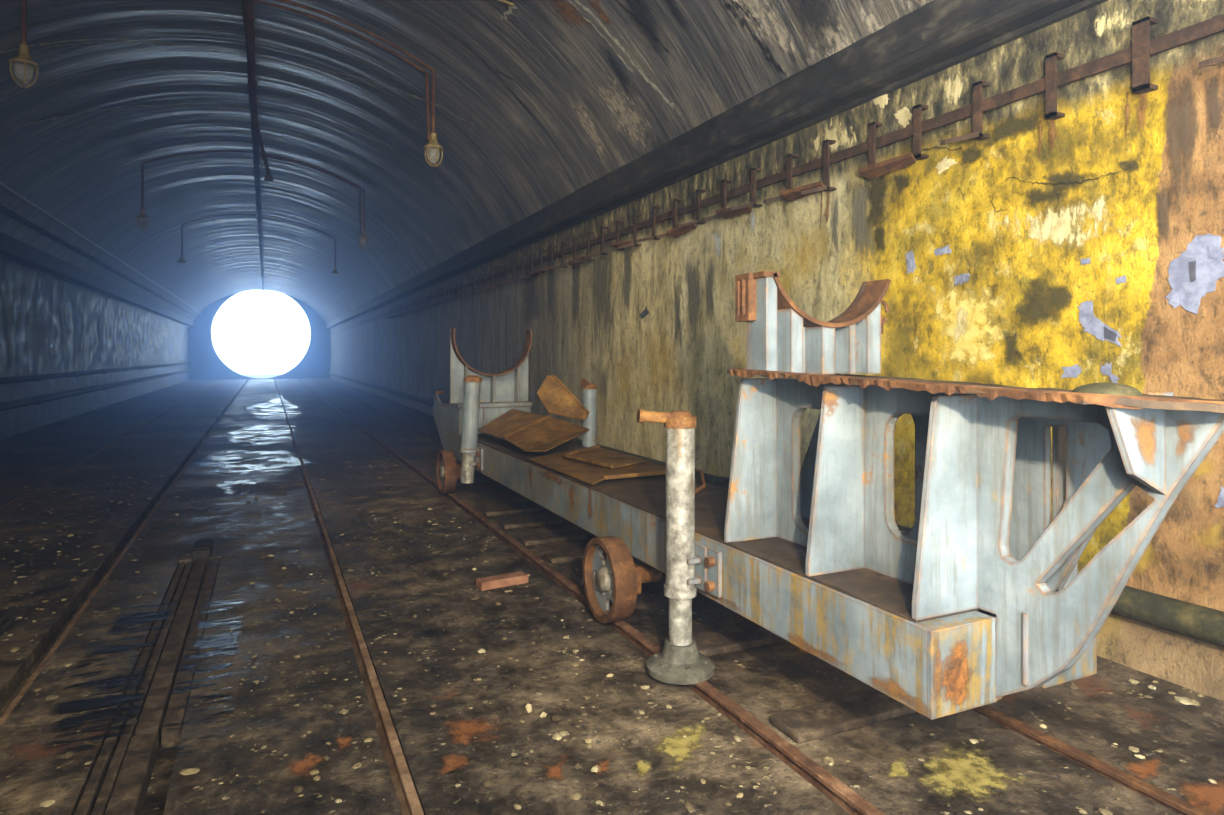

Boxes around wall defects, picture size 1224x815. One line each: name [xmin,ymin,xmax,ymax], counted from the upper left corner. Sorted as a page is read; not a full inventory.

damp [809,7,885,59]
damp [963,109,1048,164]
corrosion [1125,92,1147,136]
damp [832,175,910,254]
damp [674,236,720,345]
peeling [1165,233,1224,315]
damp [1003,279,1072,364]
peeling [1077,300,1122,346]
peeling [1061,364,1082,378]
peeling [1100,362,1119,383]
corrosion [1132,421,1155,463]
corrosion [1178,423,1191,454]